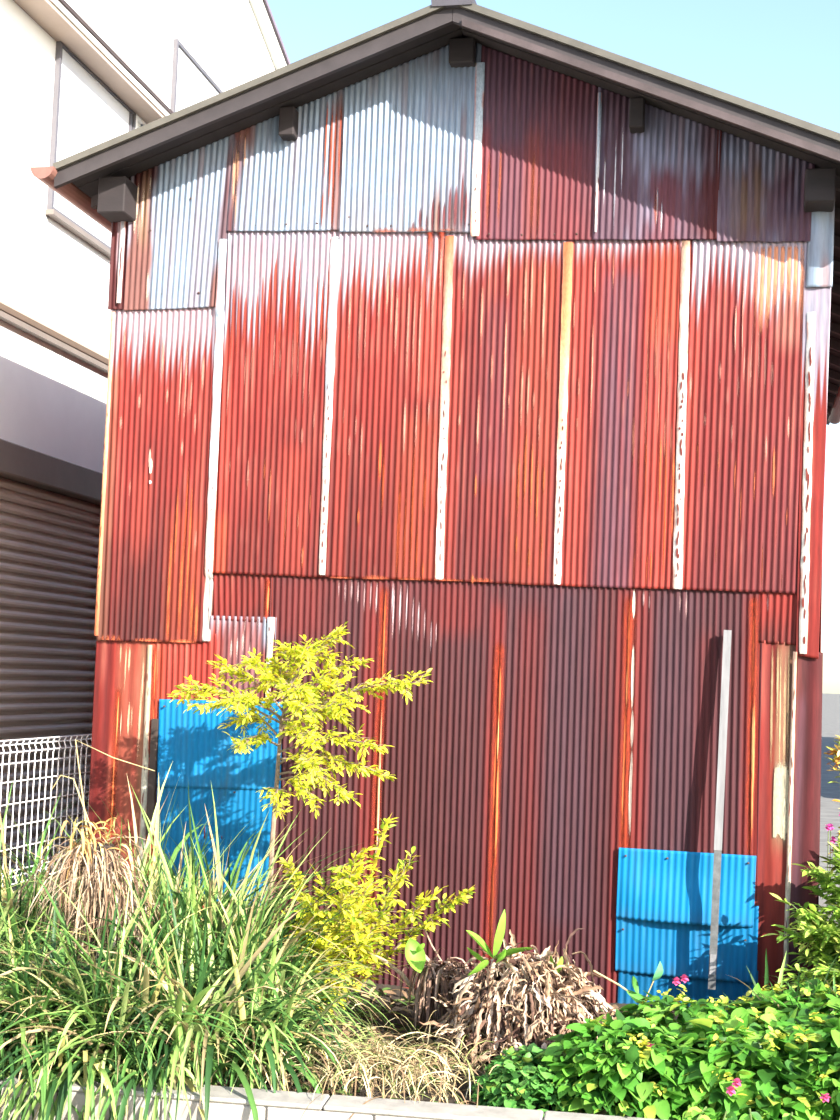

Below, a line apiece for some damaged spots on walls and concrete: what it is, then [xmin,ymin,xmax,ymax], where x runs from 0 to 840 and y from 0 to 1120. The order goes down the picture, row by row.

corrosion [486,157,501,218]
corrosion [531,160,540,223]
corrosion [231,263,329,358]
corrosion [756,246,802,320]
corrosion [396,459,426,580]
corrosion [517,436,545,521]
corrosion [638,441,674,581]
corrosion [109,690,122,844]
corrosion [367,576,387,853]
corrosion [488,645,504,957]
corrosion [620,599,634,848]
corrosion [746,598,757,844]